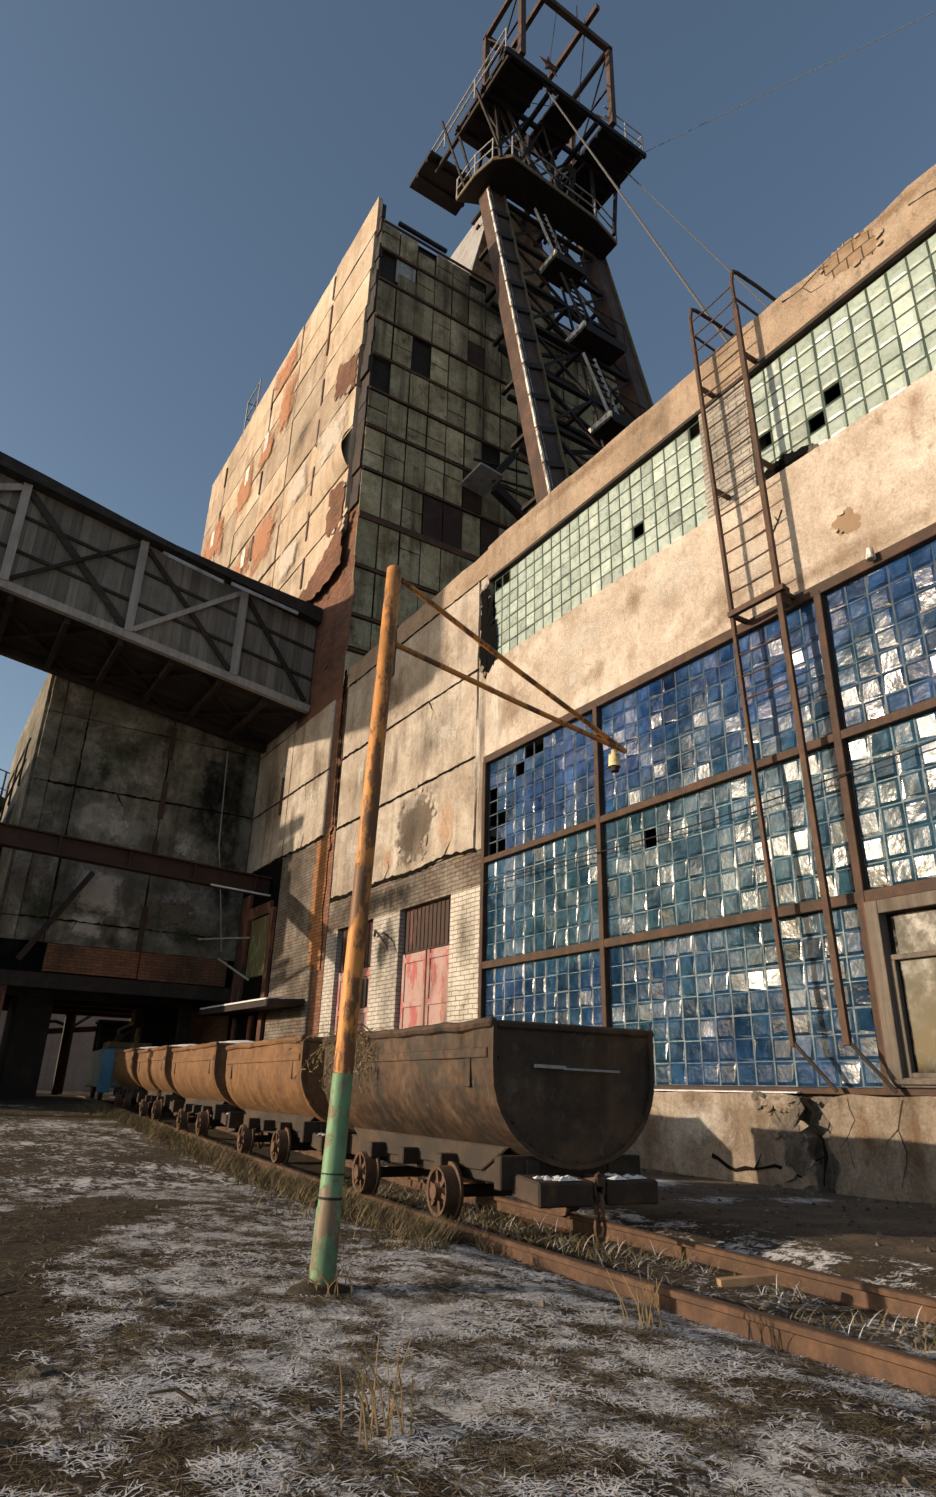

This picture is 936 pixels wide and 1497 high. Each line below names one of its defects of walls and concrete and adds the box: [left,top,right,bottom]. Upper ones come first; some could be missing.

peeling [202,344,298,559]
flaking render [233,353,358,585]
peeling [831,507,861,536]
flaking render [298,479,356,691]
spalling [479,583,496,679]
leakage [178,756,244,852]
leakage [71,870,122,937]
spalling [711,1091,817,1182]
crack [797,1096,910,1189]